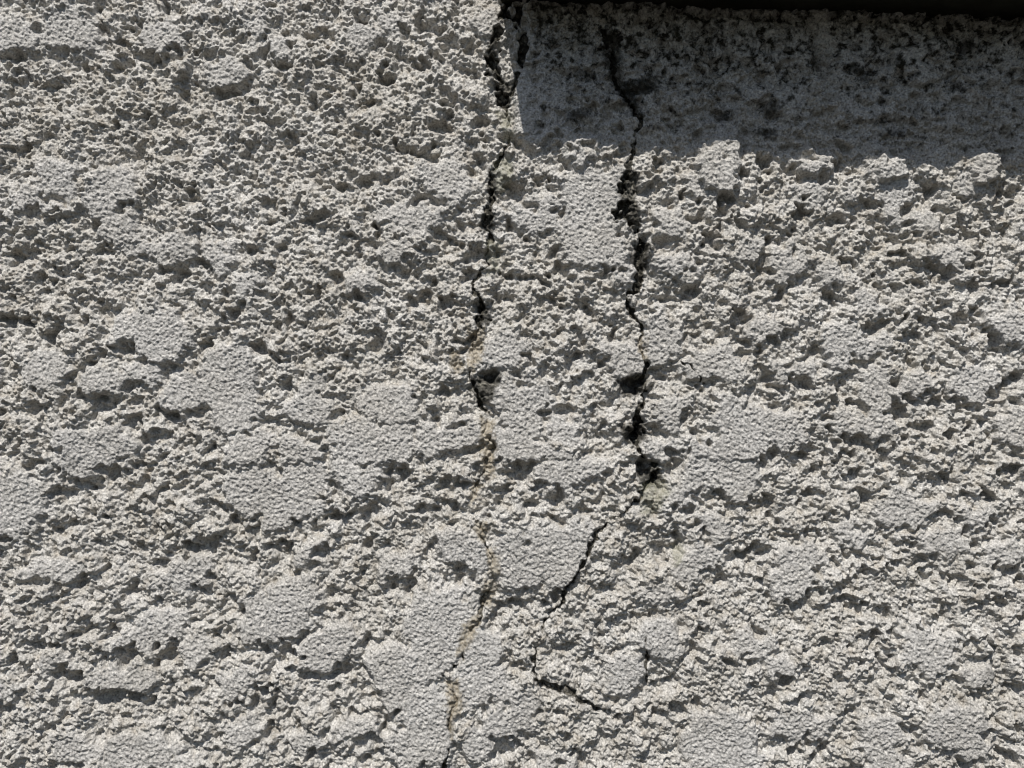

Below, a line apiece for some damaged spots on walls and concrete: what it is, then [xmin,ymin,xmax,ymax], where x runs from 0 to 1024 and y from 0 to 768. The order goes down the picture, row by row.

crack [471,2,529,340]
crack [468,371,487,413]
crack [530,29,655,711]
crack [442,591,488,768]